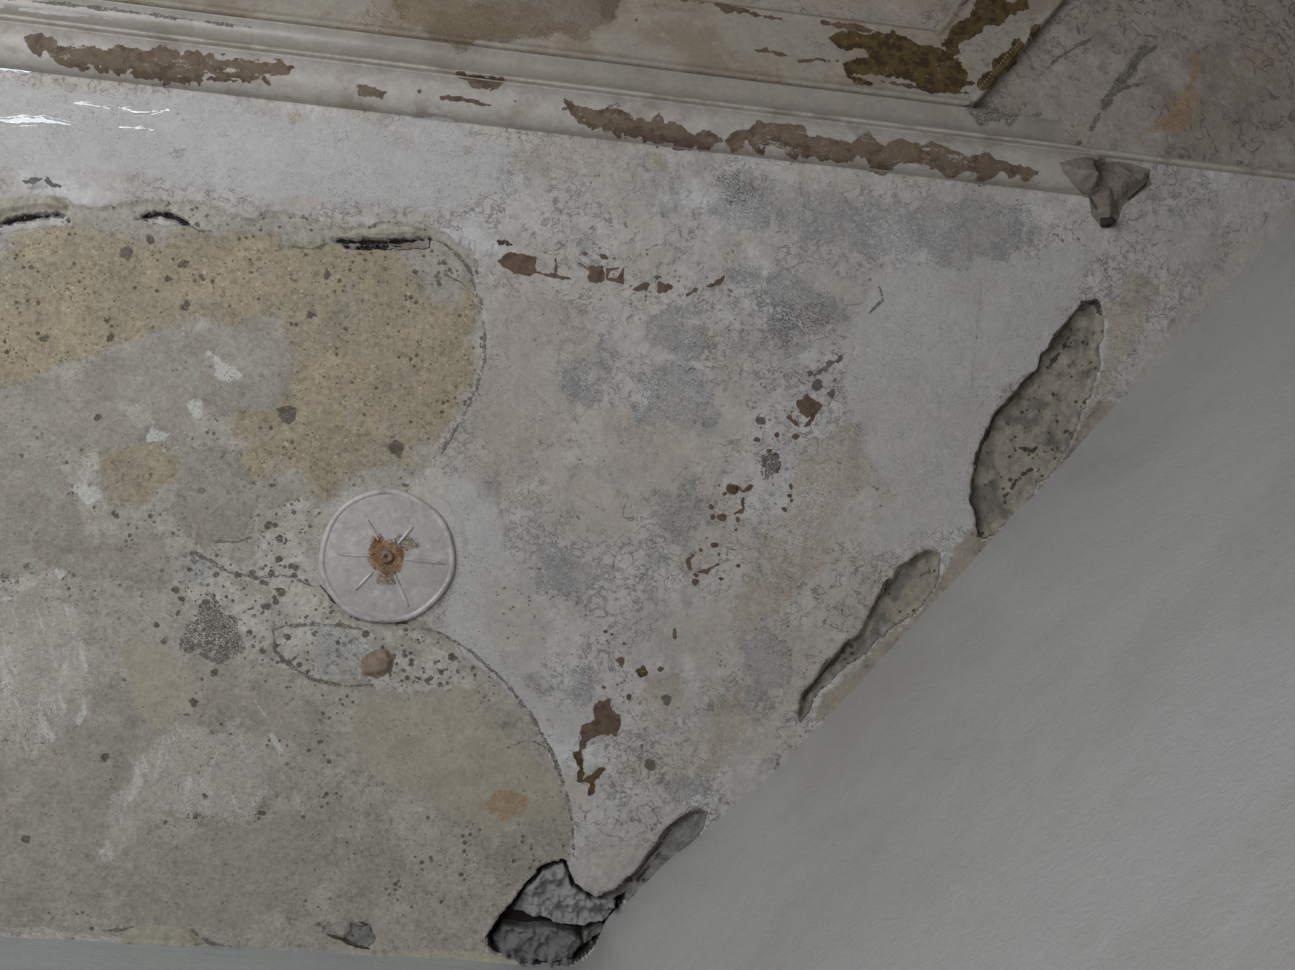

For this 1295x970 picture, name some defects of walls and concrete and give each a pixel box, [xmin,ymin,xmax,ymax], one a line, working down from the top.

peeling [681,0,782,20]
peeling [24,32,294,89]
peeling [754,0,1041,95]
peeling [562,98,1039,187]
crack [0,211,69,235]
crack [137,210,212,232]
spalling [1100,217,1116,228]
peeling [497,239,725,297]
flaking render [798,299,1117,722]
flaking render [0,176,664,961]
rust [367,534,420,586]
flaking render [598,810,708,901]